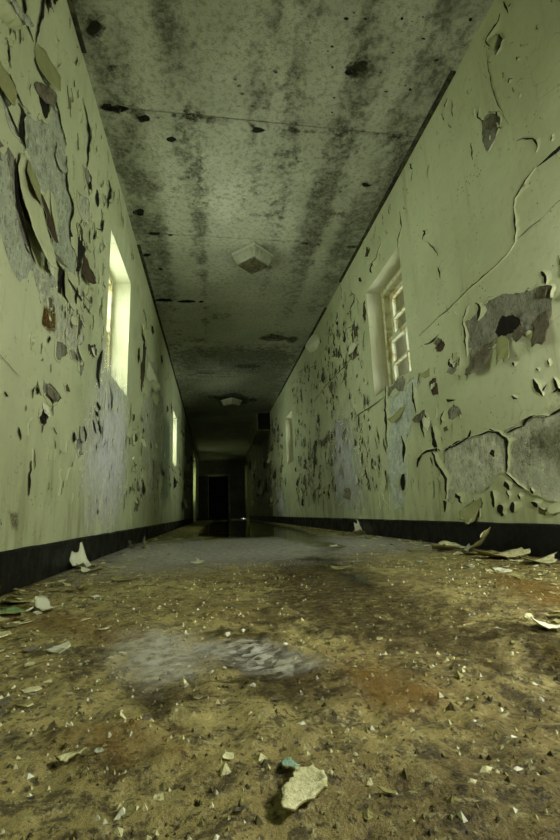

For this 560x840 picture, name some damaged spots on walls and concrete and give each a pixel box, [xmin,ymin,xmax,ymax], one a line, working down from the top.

crack [503,1,511,13]
peeling [0,42,113,376]
crack [0,0,170,525]
water stain [72,0,204,307]
water stain [166,107,213,196]
crack [364,90,560,512]
peeling [37,380,70,427]
crack [350,397,391,510]
spalling [267,270,560,524]
peeling [0,530,199,667]
peeling [291,519,558,580]
peeling [530,617,560,629]